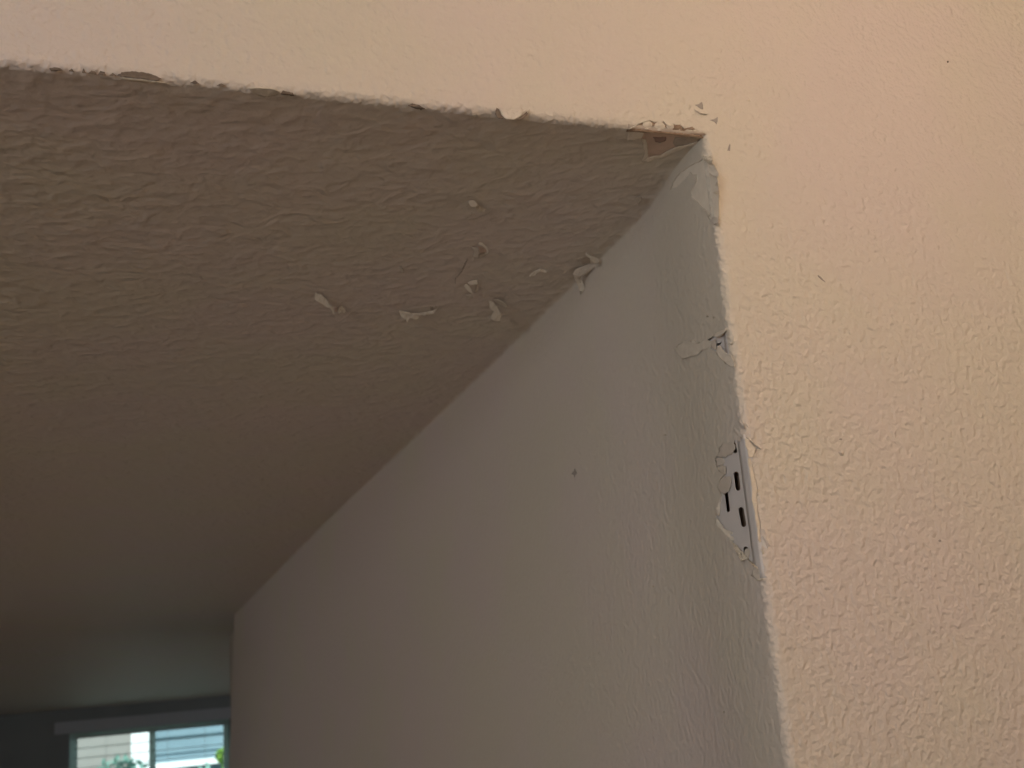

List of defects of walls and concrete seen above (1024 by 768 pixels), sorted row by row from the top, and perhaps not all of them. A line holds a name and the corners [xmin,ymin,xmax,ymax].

flaking render [626,119,720,227]
peeling [674,328,735,367]
peeling [715,434,771,581]